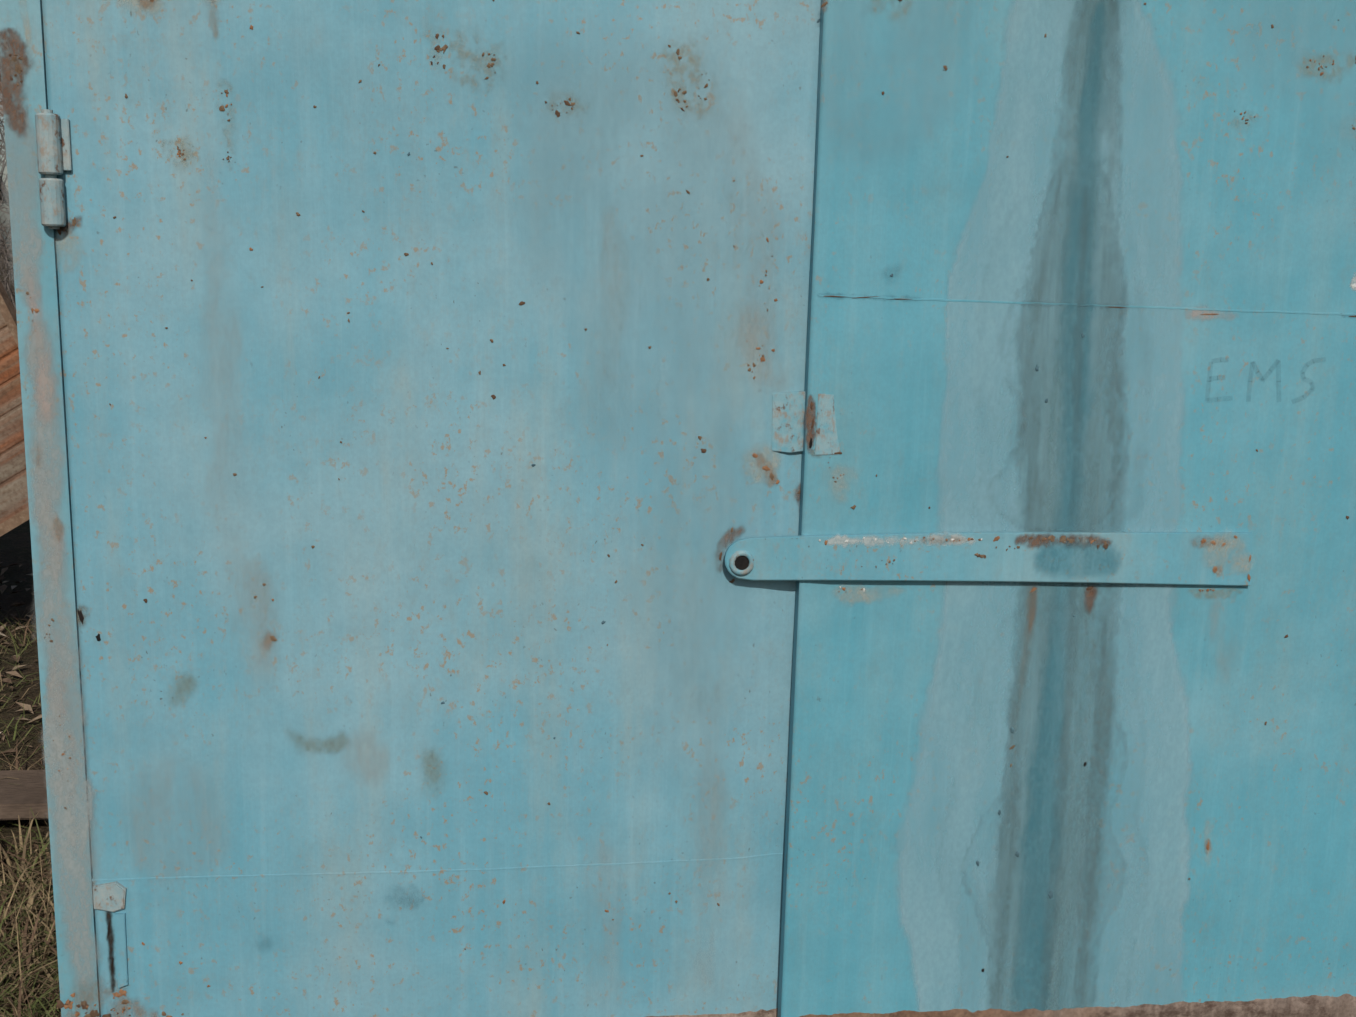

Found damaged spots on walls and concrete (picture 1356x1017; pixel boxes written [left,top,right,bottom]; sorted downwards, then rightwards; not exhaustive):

corrosion [0,28,28,133]
leakage [944,0,1144,532]
corrosion [717,527,743,583]
corrosion [819,534,1113,569]
corrosion [1199,535,1238,592]
leakage [901,581,1110,1012]
leakage [1118,584,1189,1005]
corrosion [56,989,138,1017]